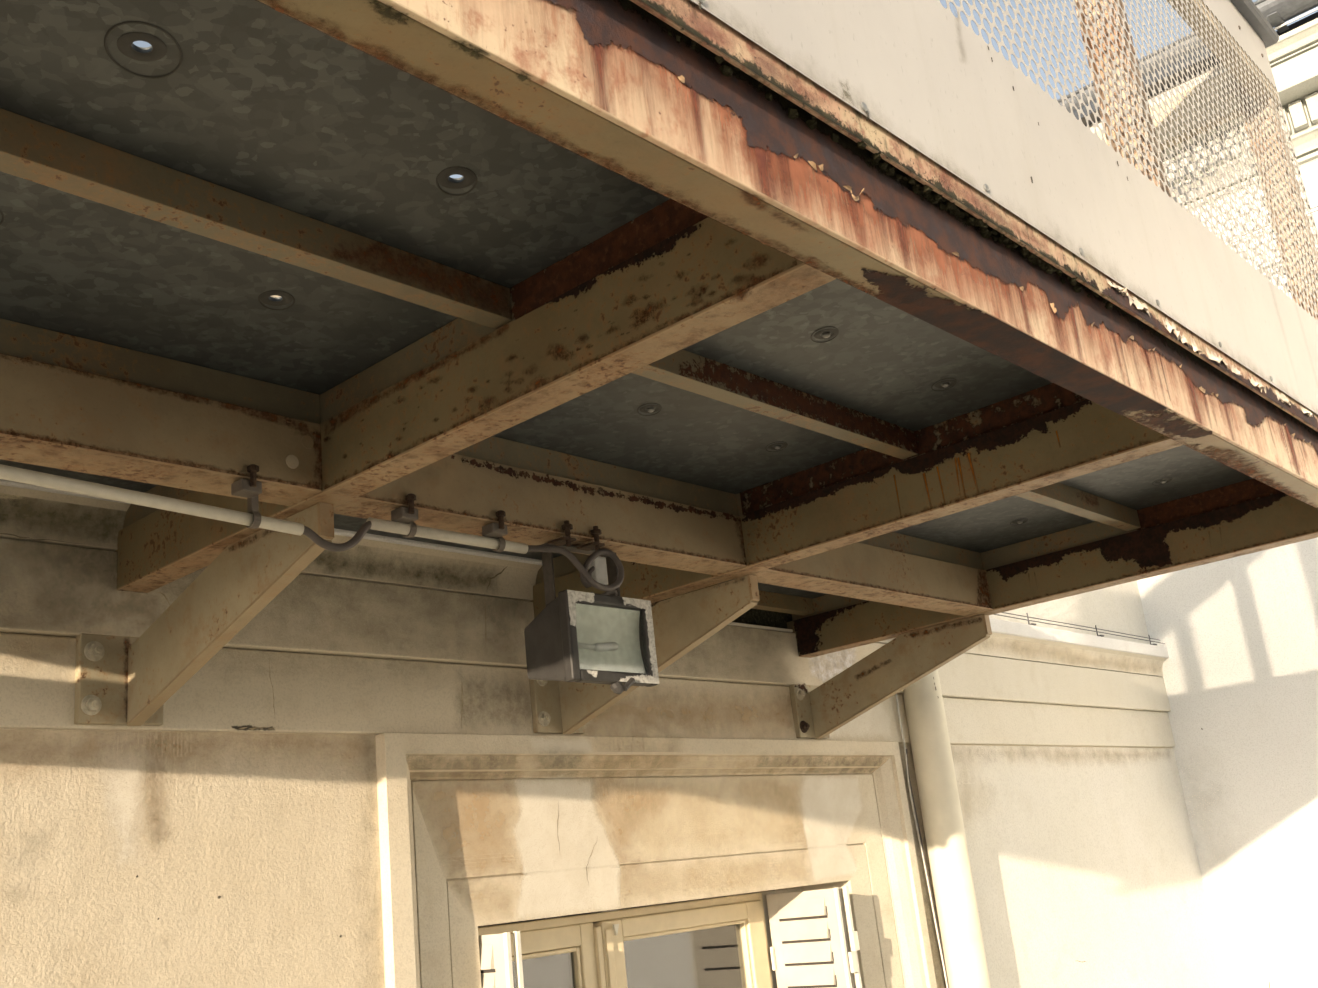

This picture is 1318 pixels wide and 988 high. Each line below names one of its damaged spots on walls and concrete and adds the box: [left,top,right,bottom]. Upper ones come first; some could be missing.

rust [0,0,1318,656]
peeling [1057,263,1318,429]
damp [444,775,622,920]
damp [800,774,864,884]